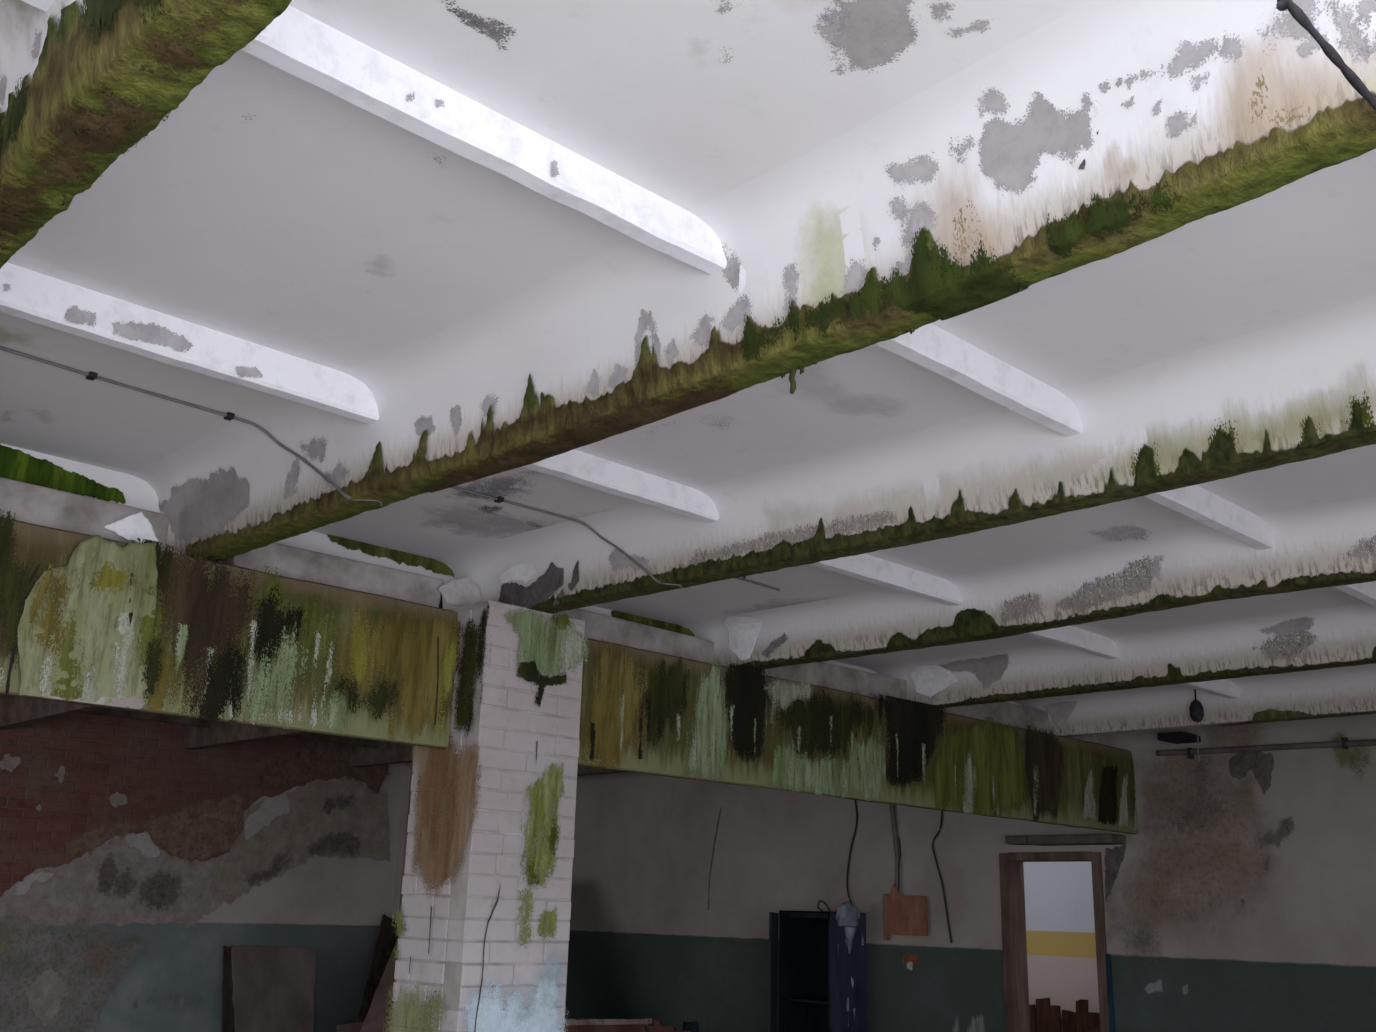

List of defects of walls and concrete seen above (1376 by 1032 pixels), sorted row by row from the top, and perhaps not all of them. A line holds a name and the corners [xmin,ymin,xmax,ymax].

water stain [0,0,87,114]
peeling [812,0,993,75]
peeling [1255,0,1376,63]
peeling [886,33,1245,277]
water stain [785,187,882,311]
water stain [757,359,922,423]
peeling [158,467,250,543]
peeling [283,435,351,500]
water stain [751,433,1128,547]
water stain [156,544,380,734]
water stain [682,633,947,802]
flaking render [0,713,391,928]